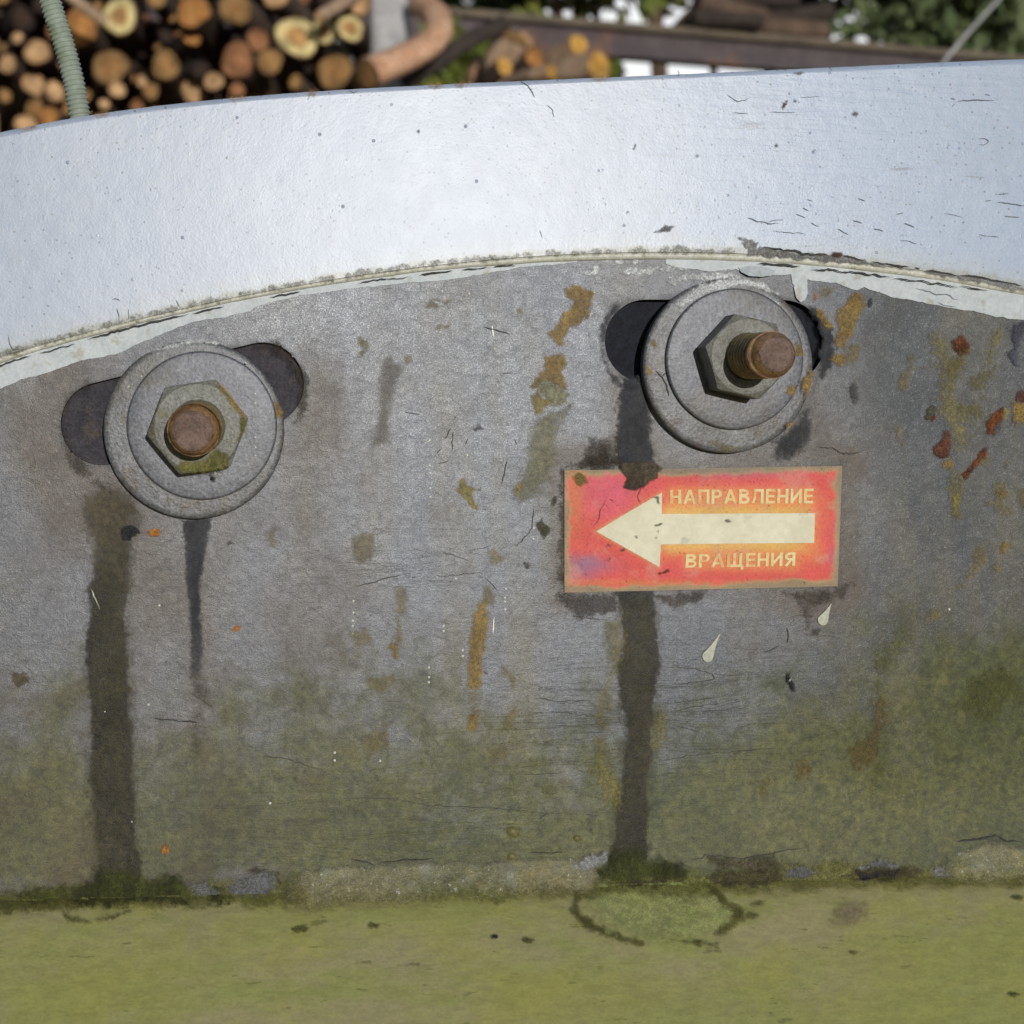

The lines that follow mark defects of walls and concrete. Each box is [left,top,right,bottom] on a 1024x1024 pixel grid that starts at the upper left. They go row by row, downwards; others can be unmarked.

peeling [0,237,1024,389]
corrosion [516,285,593,500]
damp [585,377,655,469]
corrosion [815,293,866,366]
corrosion [930,335,987,515]
corrosion [987,390,1024,436]
damp [86,488,141,882]
damp [183,518,210,672]
corrosion [469,599,489,689]
damp [611,591,660,862]
damp [571,884,764,947]